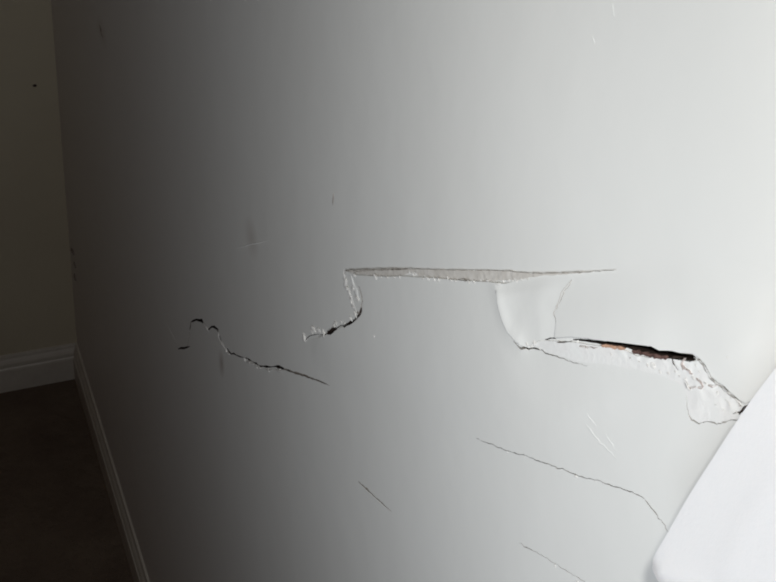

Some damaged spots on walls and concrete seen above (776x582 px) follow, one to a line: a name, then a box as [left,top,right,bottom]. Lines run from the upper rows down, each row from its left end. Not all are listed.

crack [162,317,330,386]
crack [302,269,363,342]
spalling [345,267,745,424]
crack [477,438,667,530]